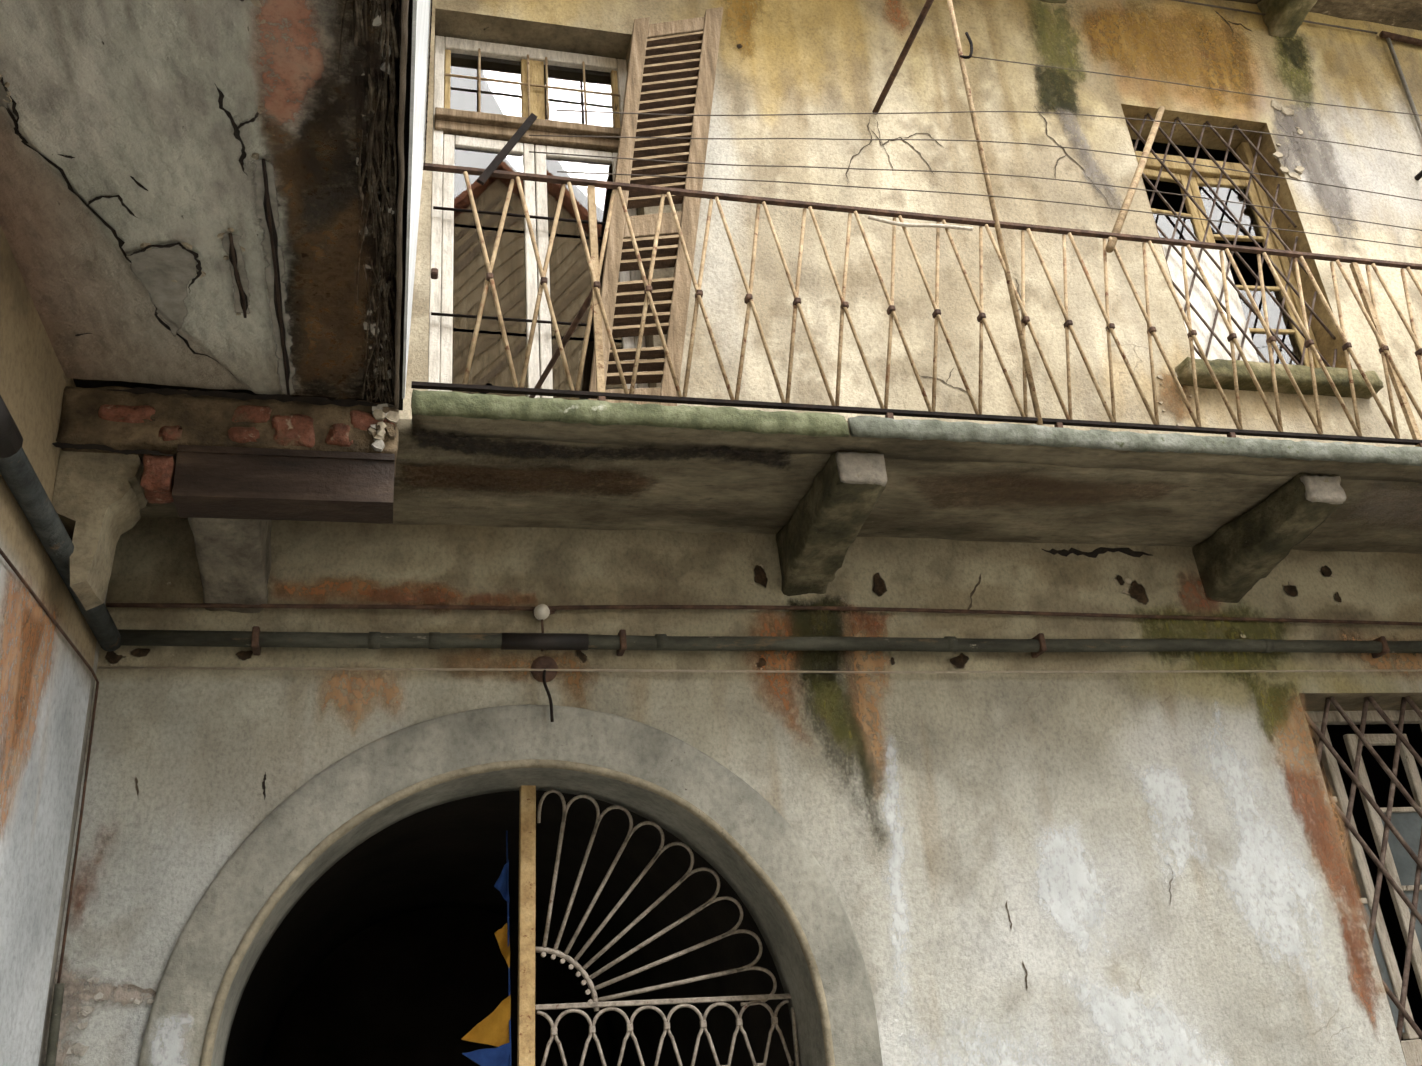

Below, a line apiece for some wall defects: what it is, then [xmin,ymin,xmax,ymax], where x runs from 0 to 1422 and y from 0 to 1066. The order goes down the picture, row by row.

crack [1,77,148,263]
leakage [263,0,392,403]
crack [845,120,947,185]
leakage [1029,1,1121,208]
flaking render [98,404,182,504]
crack [1042,547,1153,558]
hole [1114,574,1148,604]
rust [0,577,56,832]
leakage [784,598,908,966]
rust [1247,681,1375,1024]